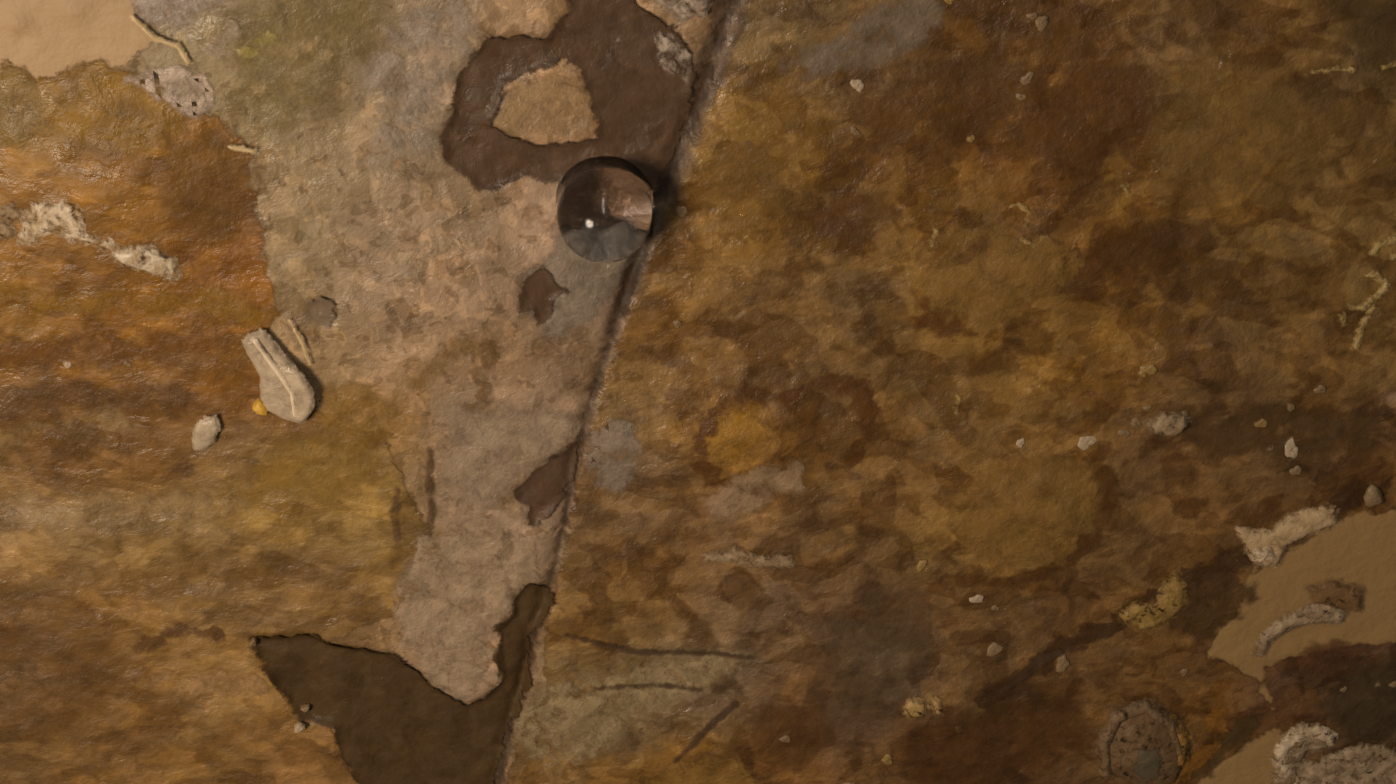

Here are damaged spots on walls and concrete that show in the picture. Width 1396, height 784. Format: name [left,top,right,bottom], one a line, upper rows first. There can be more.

leakage [0,59,428,784]
peeling [124,0,750,784]
crack [493,627,752,784]
crack [544,0,747,588]
leakage [507,0,1396,784]